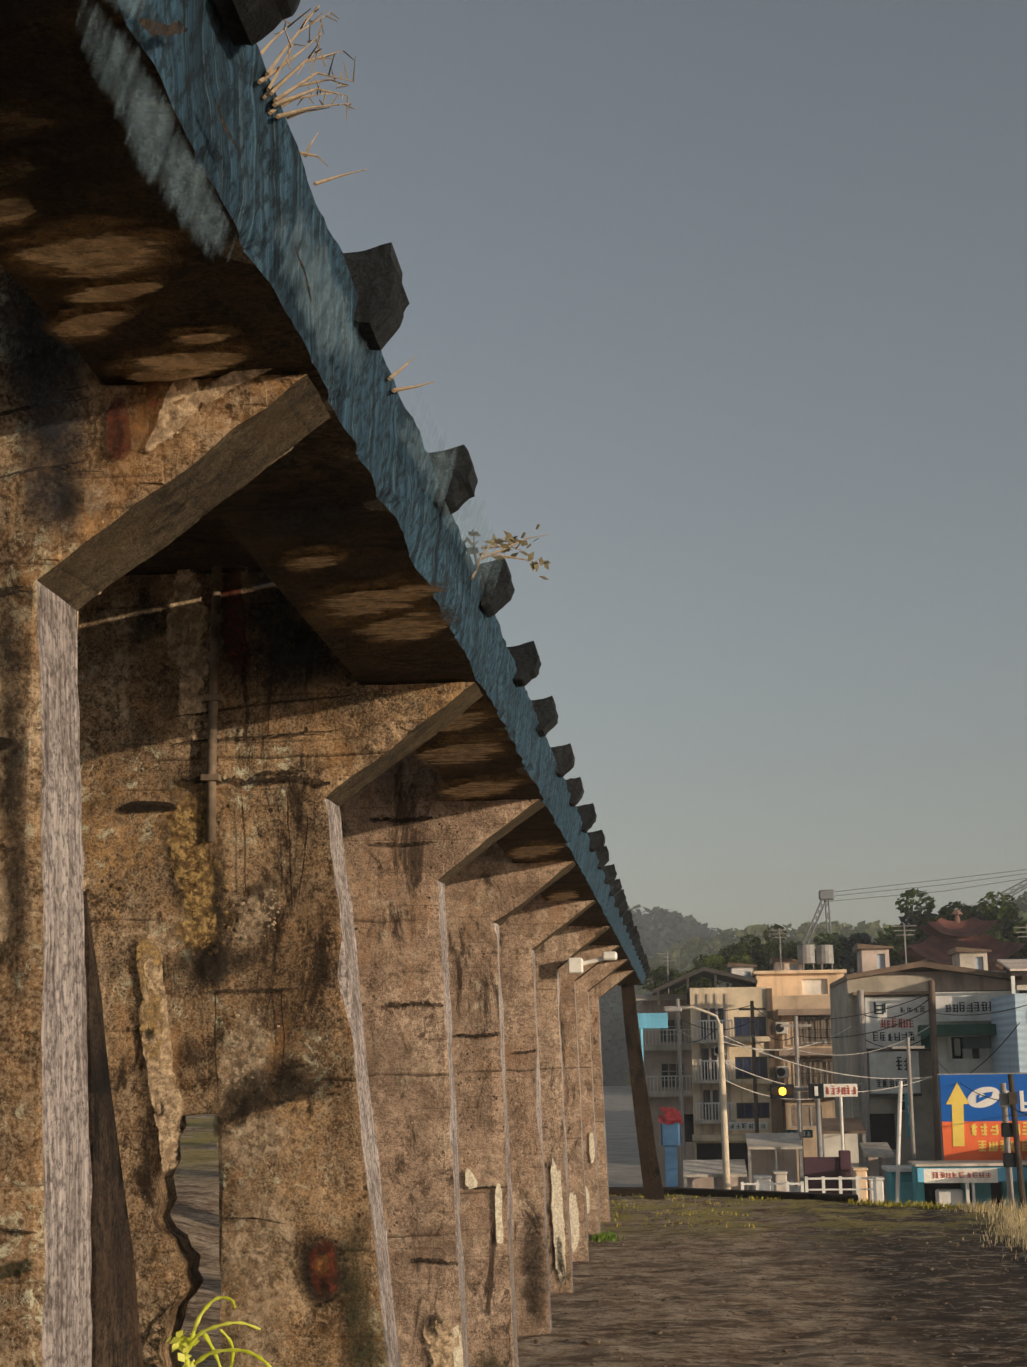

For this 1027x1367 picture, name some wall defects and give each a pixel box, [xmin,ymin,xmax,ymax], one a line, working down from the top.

crack [0,405,29,416]
spalling [111,326,273,451]
crack [0,461,103,478]
leakage [250,568,332,680]
peeling [136,934,201,1172]